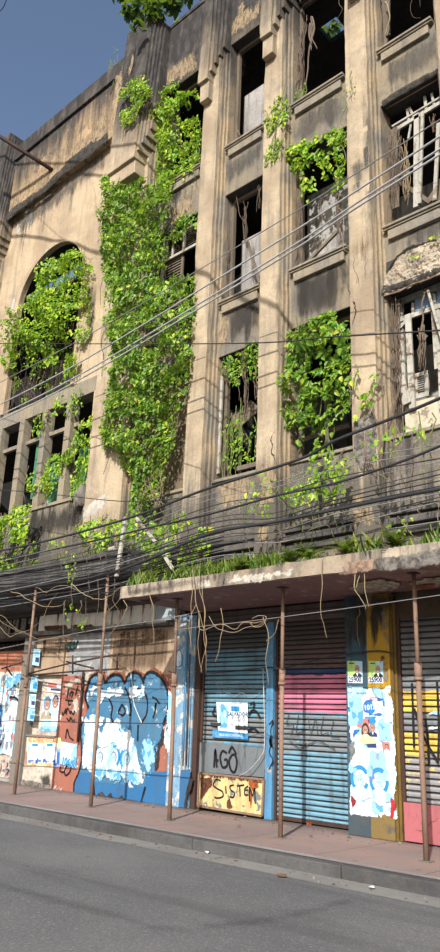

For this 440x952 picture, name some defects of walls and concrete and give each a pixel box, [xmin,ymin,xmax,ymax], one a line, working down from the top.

peeling [231,2,259,36]
spalling [339,548,440,593]